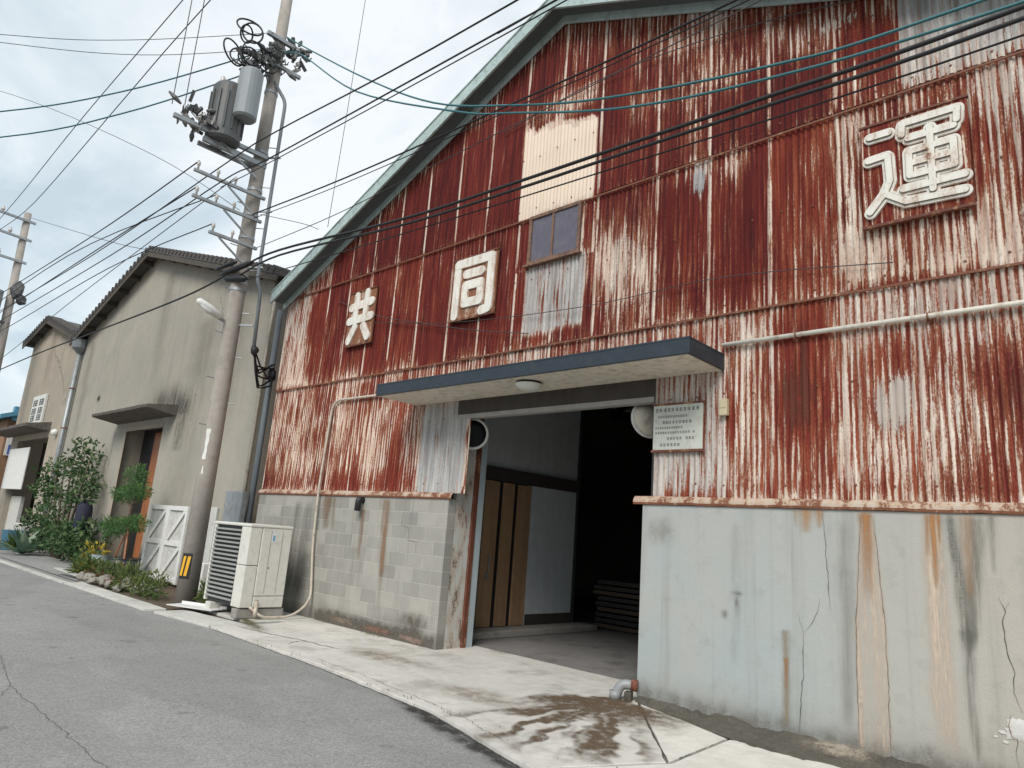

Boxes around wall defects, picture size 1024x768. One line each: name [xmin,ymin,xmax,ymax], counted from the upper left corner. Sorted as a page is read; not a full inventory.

corrosion [778,320,817,443]
crack [1,657,108,768]
damp [403,694,675,768]
corrosion [856,513,886,745]
corrosion [926,515,951,732]
damp [948,518,978,663]
spalling [994,716,1024,744]
crack [1001,603,1023,713]